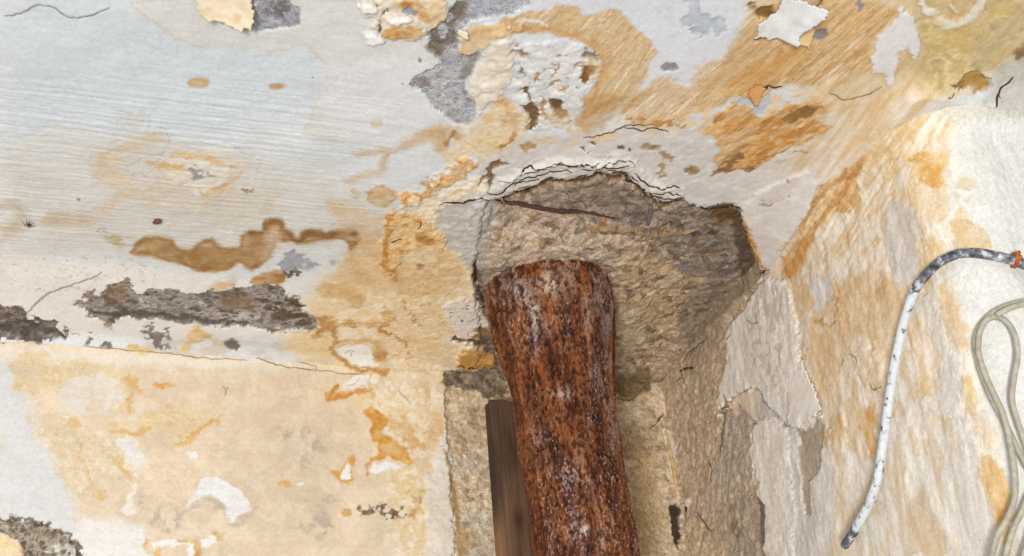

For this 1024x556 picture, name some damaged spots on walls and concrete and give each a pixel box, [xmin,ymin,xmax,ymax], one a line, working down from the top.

peeling [195,0,301,33]
peeling [747,0,829,49]
flaking render [356,0,608,154]
leakage [342,119,453,186]
leakage [0,111,398,301]
crack [391,160,743,243]
leakage [903,149,993,357]
spalling [0,249,336,351]
peeling [716,278,824,556]
leakage [961,371,979,418]
spalling [0,513,85,556]
leakage [977,453,1017,545]